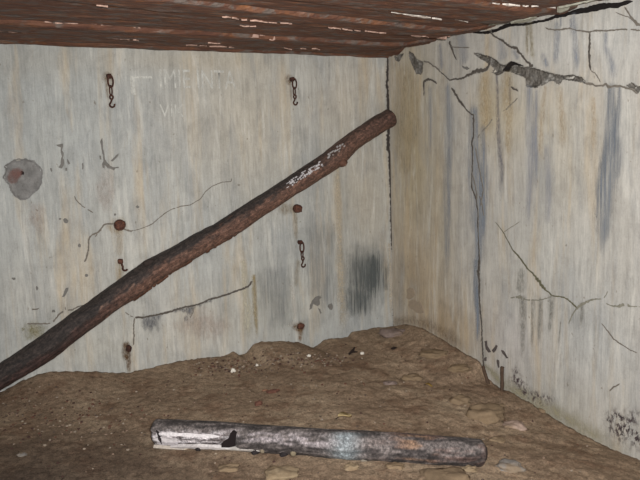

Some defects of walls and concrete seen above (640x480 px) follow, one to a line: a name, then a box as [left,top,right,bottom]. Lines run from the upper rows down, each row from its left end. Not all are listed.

spalling [394,51,423,75]
crack [449,41,469,60]
crack [490,30,533,68]
spalling [474,52,586,88]
crack [545,7,640,94]
spalling [3,144,70,200]
water stain [598,88,621,239]
crack [74,178,232,262]
crack [423,60,640,366]
crack [125,281,253,345]
water stain [607,414,640,444]